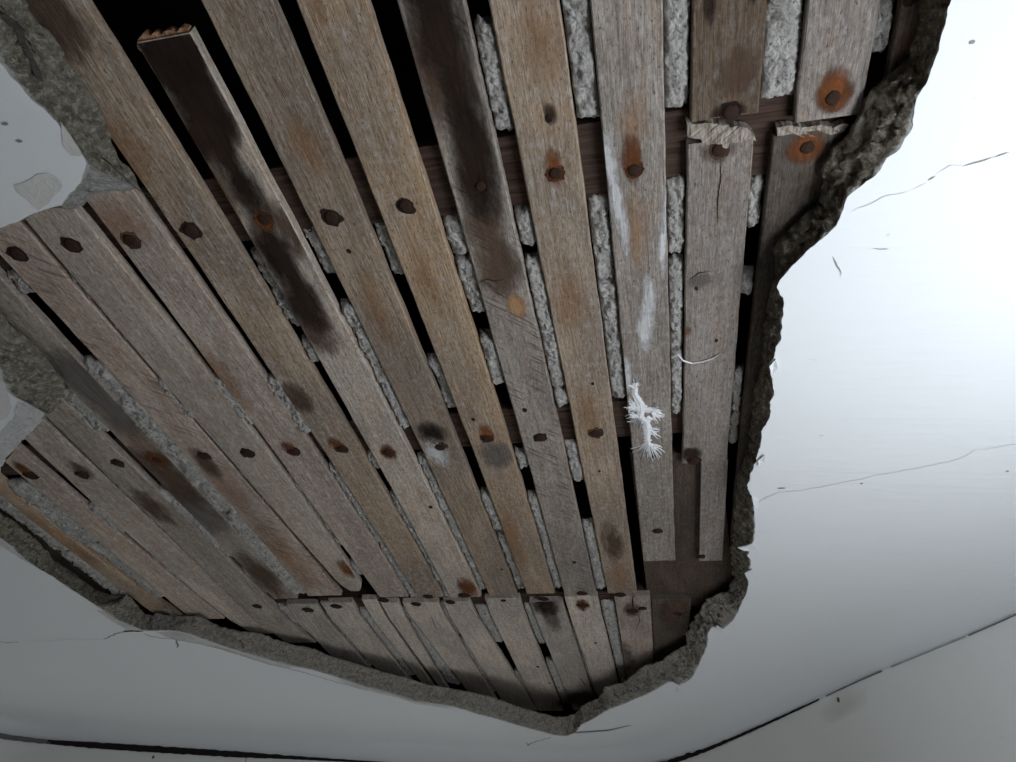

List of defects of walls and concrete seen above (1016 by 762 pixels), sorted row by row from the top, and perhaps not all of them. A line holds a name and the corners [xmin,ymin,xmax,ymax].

spalling [0,0,139,226]
water stain [138,34,335,352]
water stain [406,0,521,294]
corrosion [622,138,642,179]
corrosion [818,71,852,110]
crack [854,152,1013,211]
spalling [730,0,951,593]
water stain [624,380,665,461]
crack [0,733,380,762]
spalling [0,512,747,737]
corrosion [458,580,476,595]
crack [661,614,1016,762]